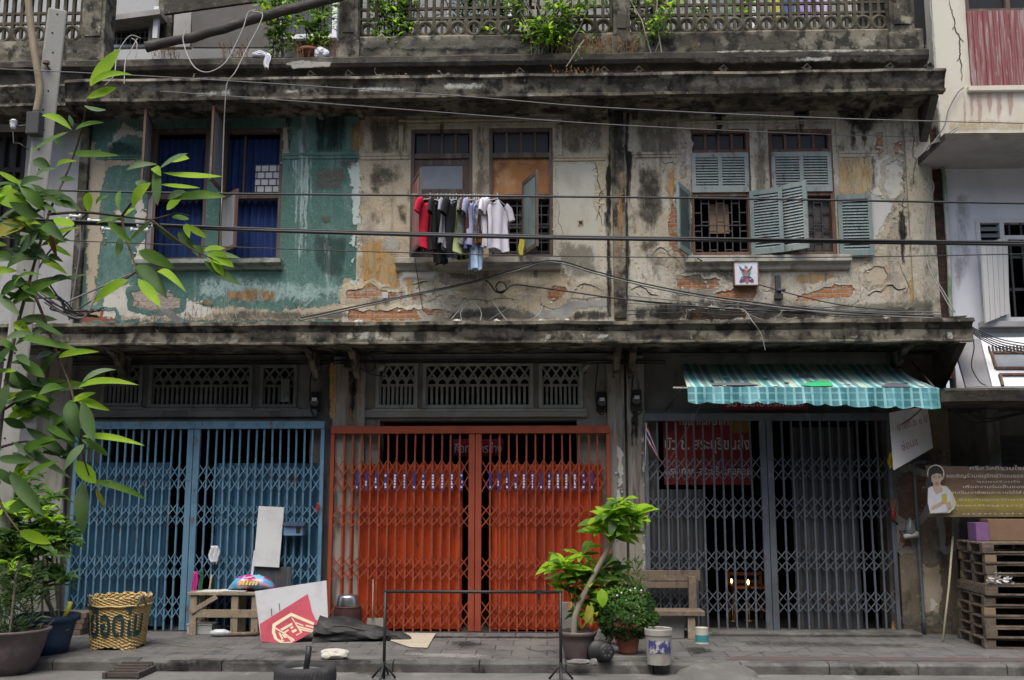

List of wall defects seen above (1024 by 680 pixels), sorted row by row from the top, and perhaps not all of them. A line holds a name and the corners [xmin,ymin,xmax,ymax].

crack [930,0,964,80]
peeling [73,123,483,323]
peeling [540,161,603,309]
water stain [560,110,933,338]
spalling [777,126,914,319]
crack [803,261,909,296]